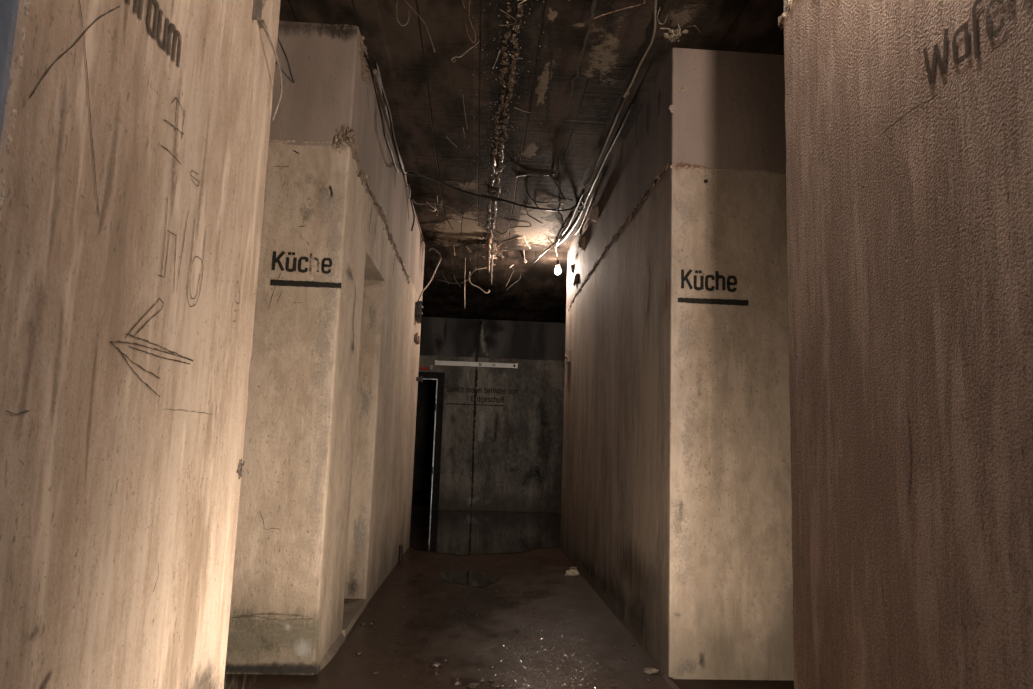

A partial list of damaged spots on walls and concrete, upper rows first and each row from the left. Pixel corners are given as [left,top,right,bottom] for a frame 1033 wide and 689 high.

spalling [332,126,410,283]